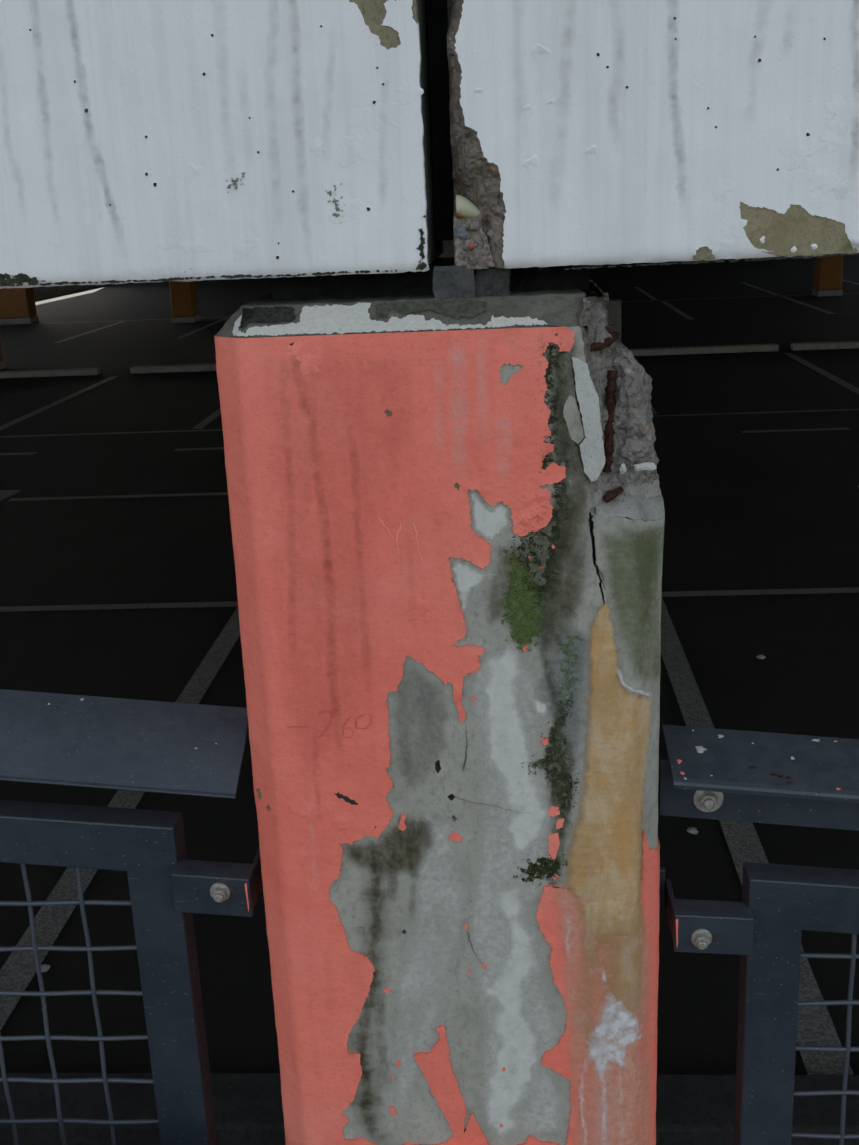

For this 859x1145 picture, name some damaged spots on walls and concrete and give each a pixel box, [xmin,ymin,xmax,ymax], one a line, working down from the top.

peeling [349,0,401,50]
spalling [447,0,506,269]
peeling [693,246,715,260]
peeling [739,202,858,256]
crack [571,356,588,481]
crack [588,508,605,604]
peeling [329,279,665,1145]
corrosion [557,603,651,1145]
efflorescence [590,1000,641,1073]